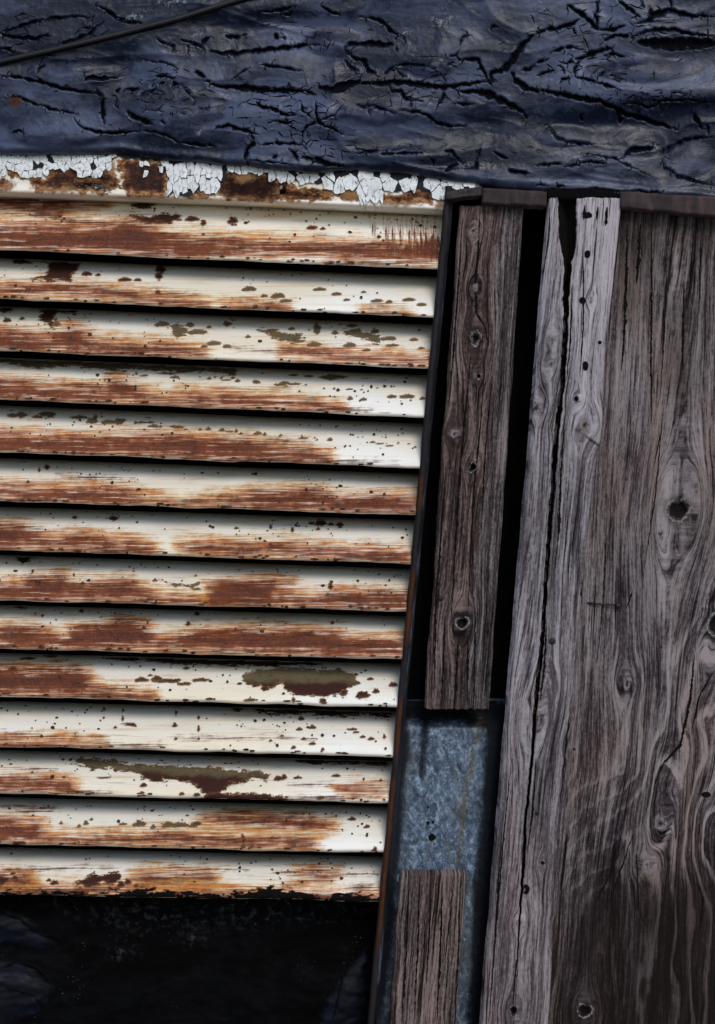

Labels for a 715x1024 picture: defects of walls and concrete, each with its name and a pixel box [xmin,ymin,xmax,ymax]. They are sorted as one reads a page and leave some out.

crack [0,0,715,190]
peeling [0,154,117,178]
rust [0,157,444,267]
peeling [139,161,476,212]
crack [595,186,665,194]
peeling [245,322,398,351]
rust [0,372,367,413]
rust [0,476,423,514]
rust [0,517,415,700]
crack [512,180,577,1010]
peeling [61,658,398,800]
rust [0,767,396,949]